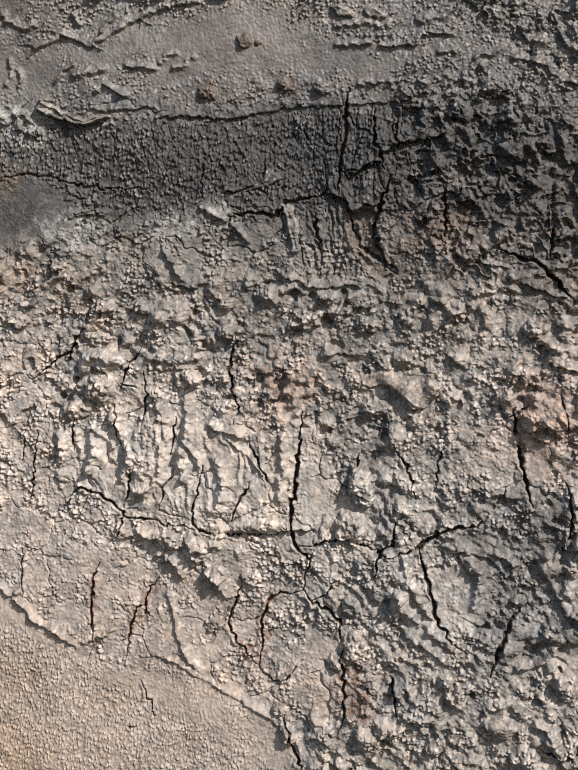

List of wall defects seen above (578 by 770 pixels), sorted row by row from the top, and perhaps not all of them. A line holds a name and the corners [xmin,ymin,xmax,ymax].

peeling [35,101,110,126]
crack [229,90,400,246]
peeling [281,203,301,254]
crack [506,226,571,297]
peeling [350,370,437,445]
crack [72,416,177,537]
crack [504,407,532,504]
crack [190,412,489,649]
crack [228,583,347,727]
spalling [516,632,553,670]
peeling [483,716,519,739]
peeling [547,729,565,761]